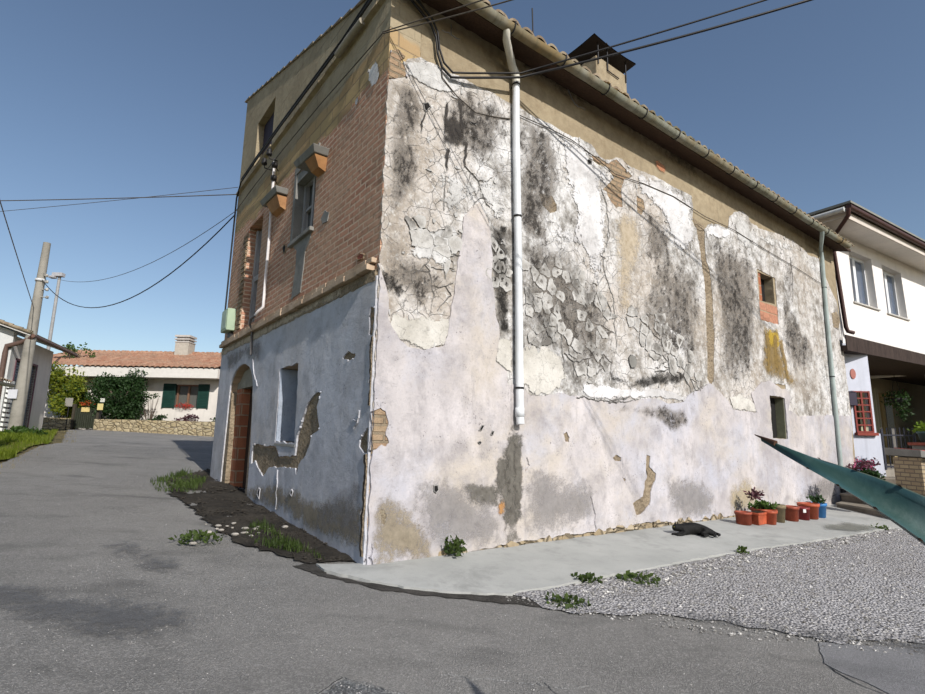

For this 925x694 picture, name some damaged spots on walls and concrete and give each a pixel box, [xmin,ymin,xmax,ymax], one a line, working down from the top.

damp [444,93,506,187]
crack [401,166,493,311]
damp [491,226,509,331]
damp [520,118,613,367]
crack [523,189,639,404]
peeling [402,137,802,401]
spalling [250,391,321,476]
spalling [360,408,388,454]
damp [374,426,592,564]
spalling [633,455,655,516]
damp [611,372,686,387]
crack [648,326,707,394]